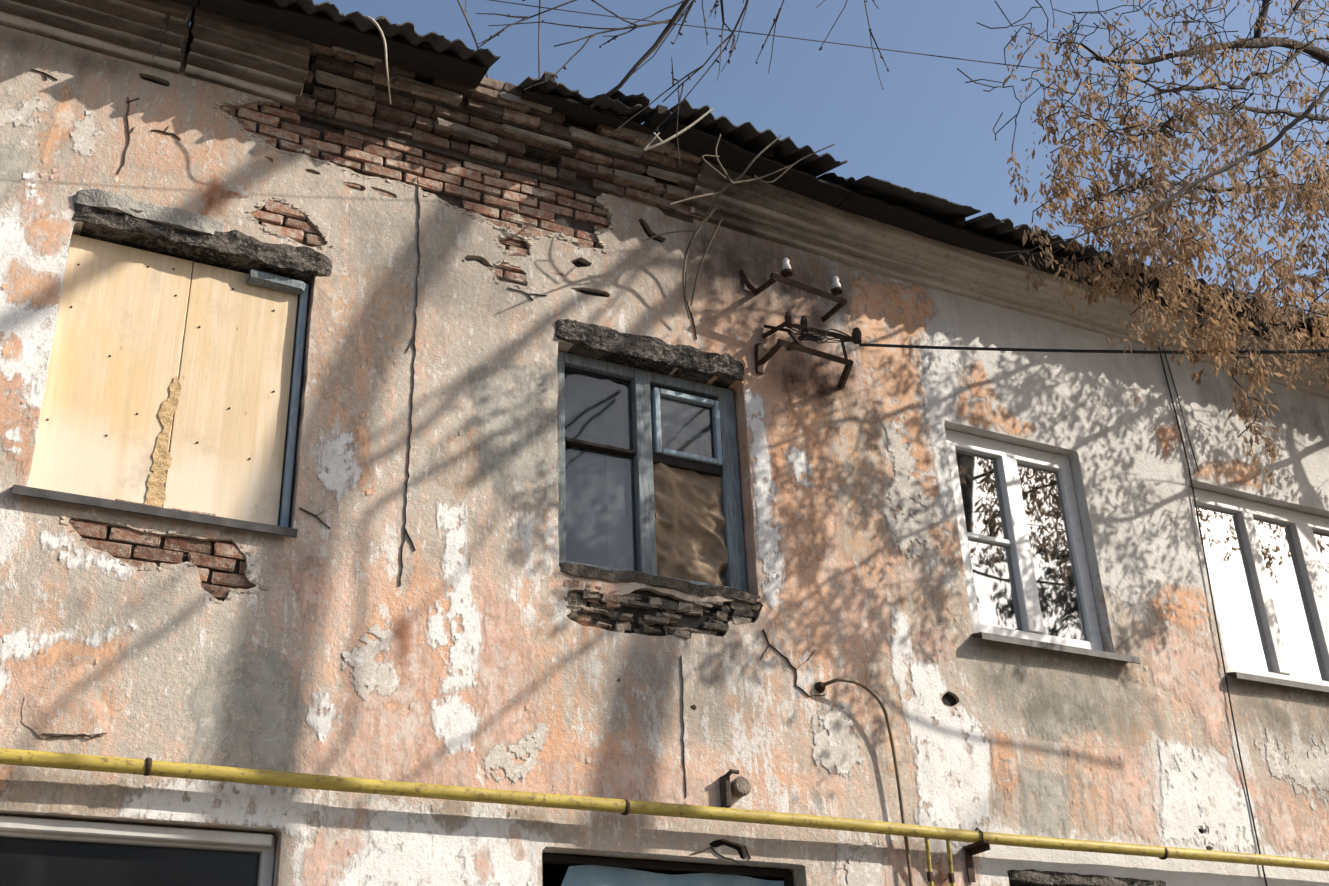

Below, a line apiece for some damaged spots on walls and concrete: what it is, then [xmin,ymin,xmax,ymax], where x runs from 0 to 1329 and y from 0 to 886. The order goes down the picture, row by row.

peeling [0,84,103,476]
crack [400,176,421,586]
flaking render [214,94,615,289]
peeling [562,275,1035,639]
peeling [0,412,705,886]
crack [761,629,826,697]
peeling [809,579,1021,886]